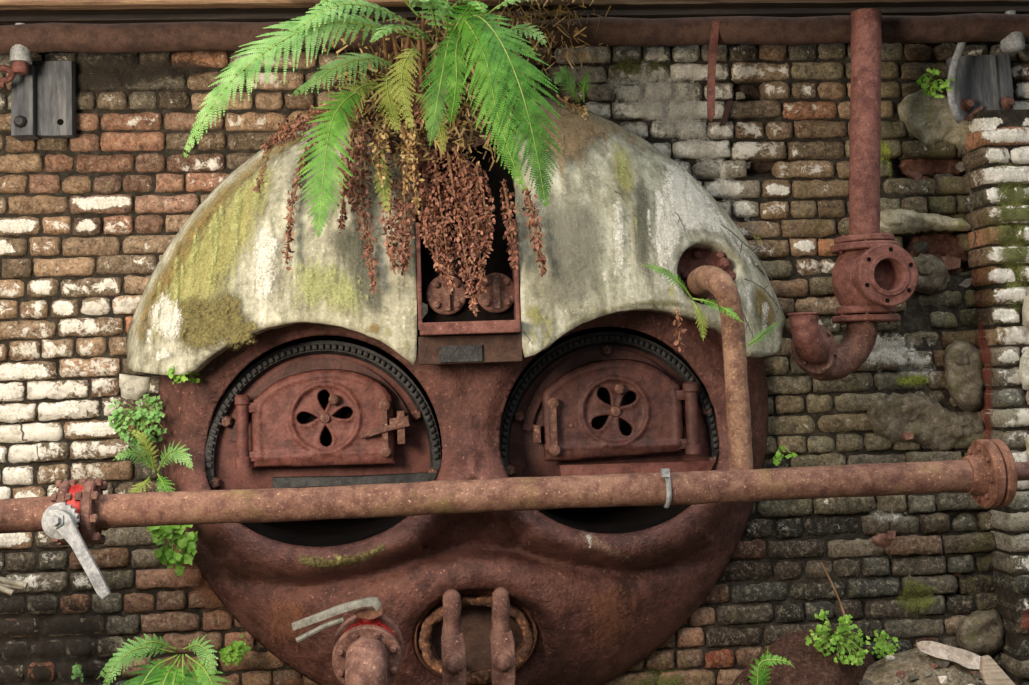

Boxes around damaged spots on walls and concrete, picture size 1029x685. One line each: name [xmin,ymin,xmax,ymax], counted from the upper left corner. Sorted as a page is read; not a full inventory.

leakage [157,180,267,316]